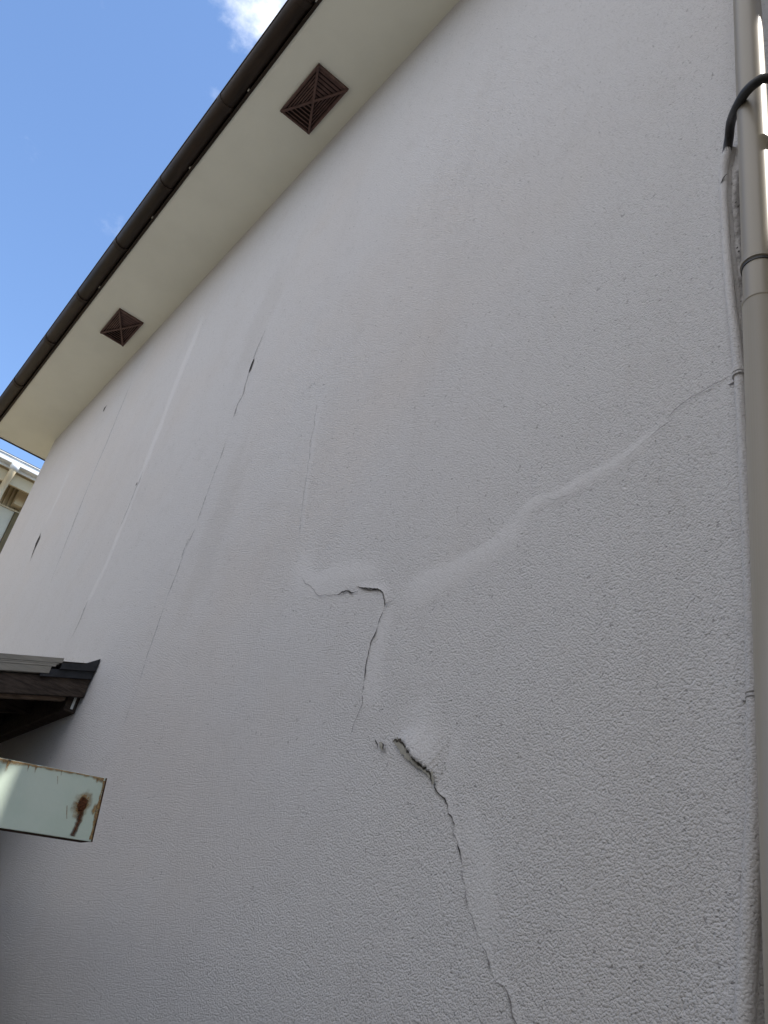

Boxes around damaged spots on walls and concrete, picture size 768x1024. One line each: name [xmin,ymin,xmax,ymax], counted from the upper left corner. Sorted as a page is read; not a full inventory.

crack [108,359,254,765]